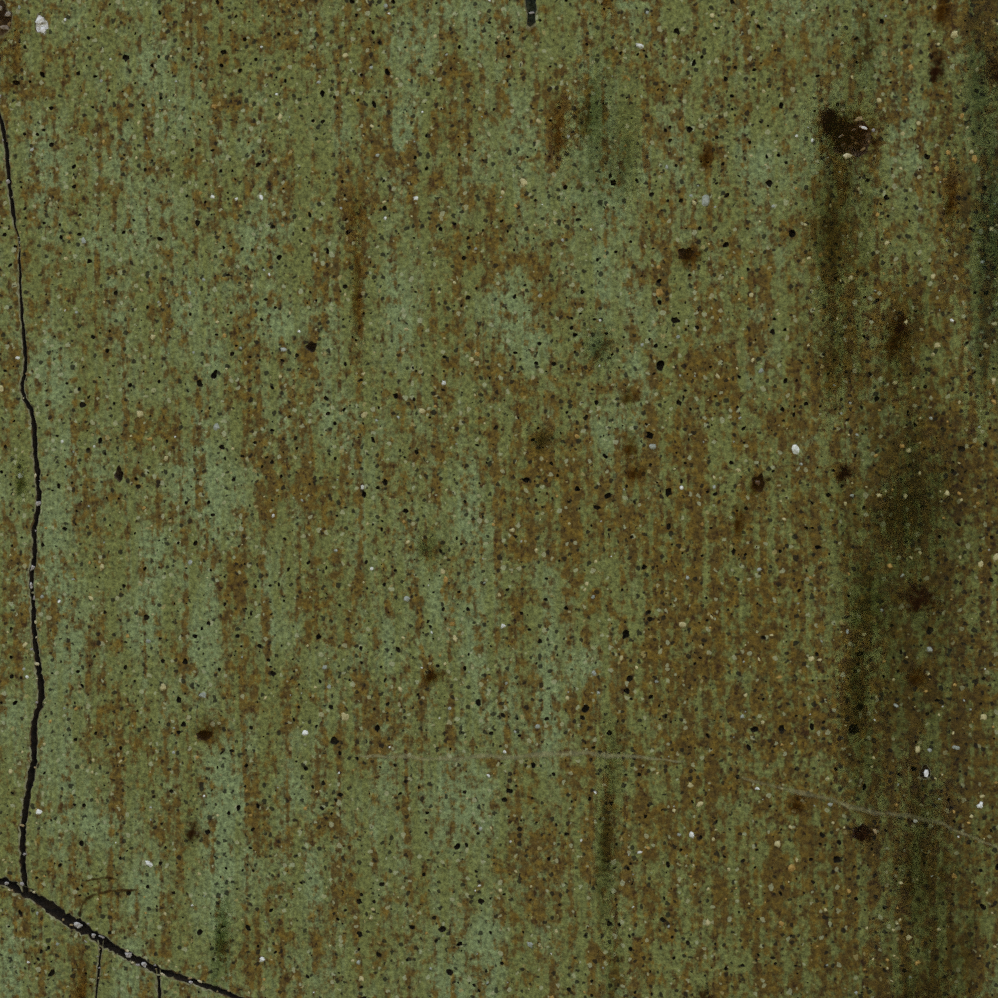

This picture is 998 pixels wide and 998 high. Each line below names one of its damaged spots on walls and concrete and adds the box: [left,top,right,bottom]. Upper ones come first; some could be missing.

corrosion [929,51,945,83]
corrosion [835,465,852,481]
crack [0,95,245,998]
crack [361,750,684,763]
crack [742,777,998,848]
corrosion [186,821,200,842]